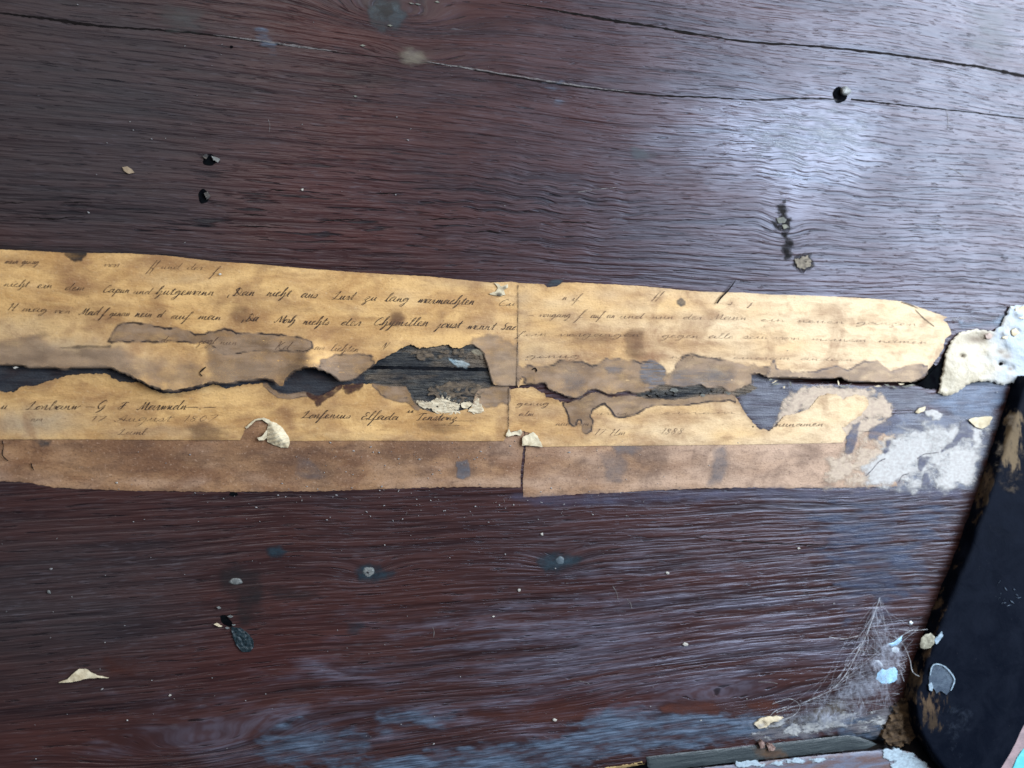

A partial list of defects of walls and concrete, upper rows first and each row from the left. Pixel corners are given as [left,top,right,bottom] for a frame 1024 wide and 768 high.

crack [0,2,1024,119]
peeling [0,365,367,396]
peeling [647,388,681,397]